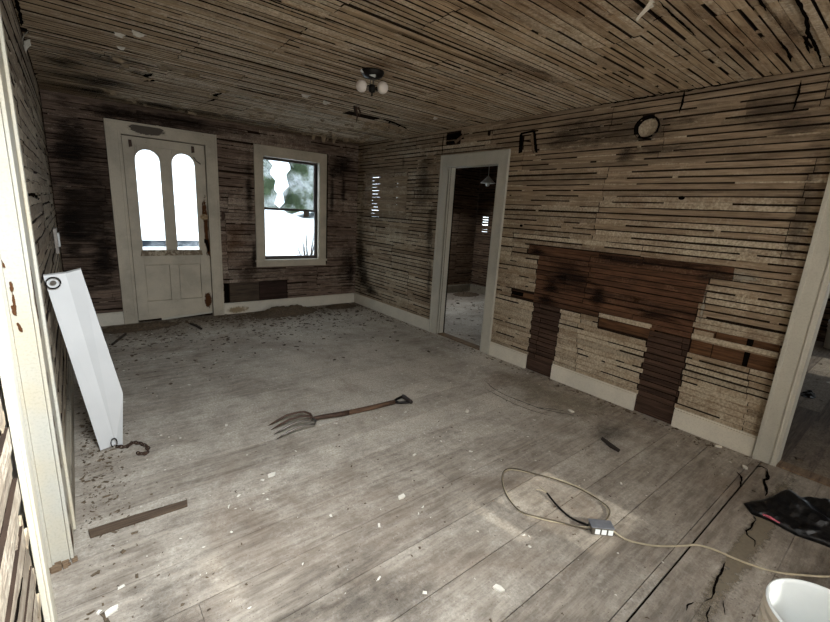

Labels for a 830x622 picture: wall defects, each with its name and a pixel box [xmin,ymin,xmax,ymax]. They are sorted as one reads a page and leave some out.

crack [781,0,823,66]
crack [792,82,801,112]
crack [626,466,770,622]